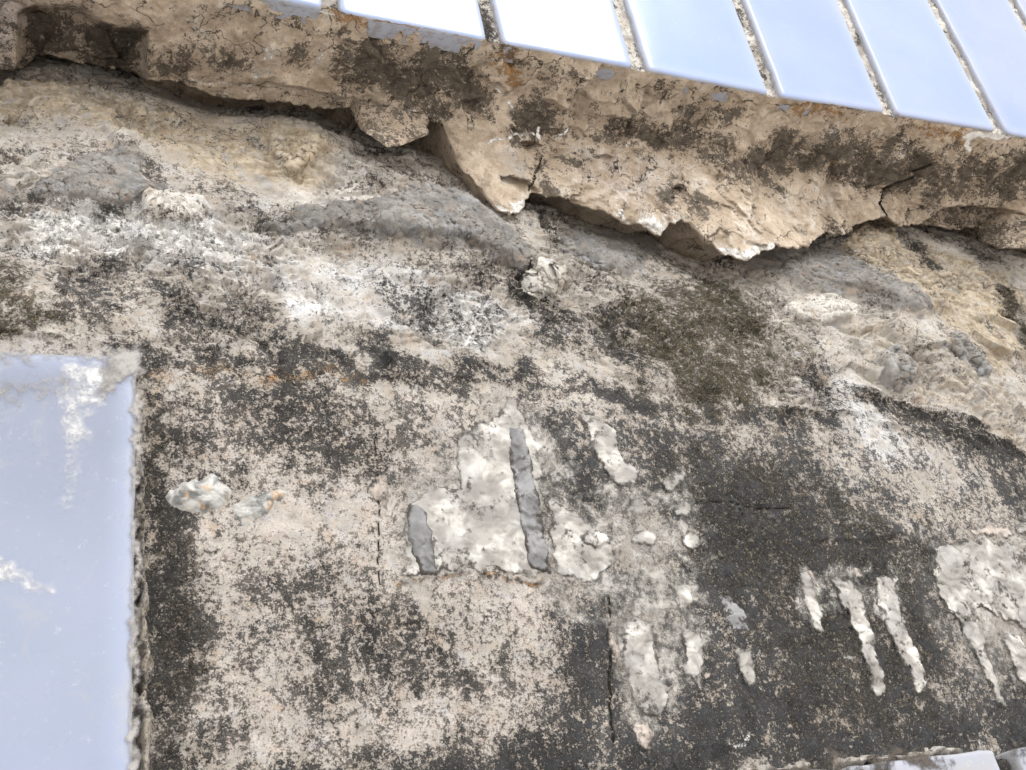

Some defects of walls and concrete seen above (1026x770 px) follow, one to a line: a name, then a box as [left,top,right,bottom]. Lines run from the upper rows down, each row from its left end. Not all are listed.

spalling [0,0,1026,470]
crack [878,164,933,216]
leakage [0,286,215,770]
peeling [136,353,1026,770]
leakage [597,258,974,745]